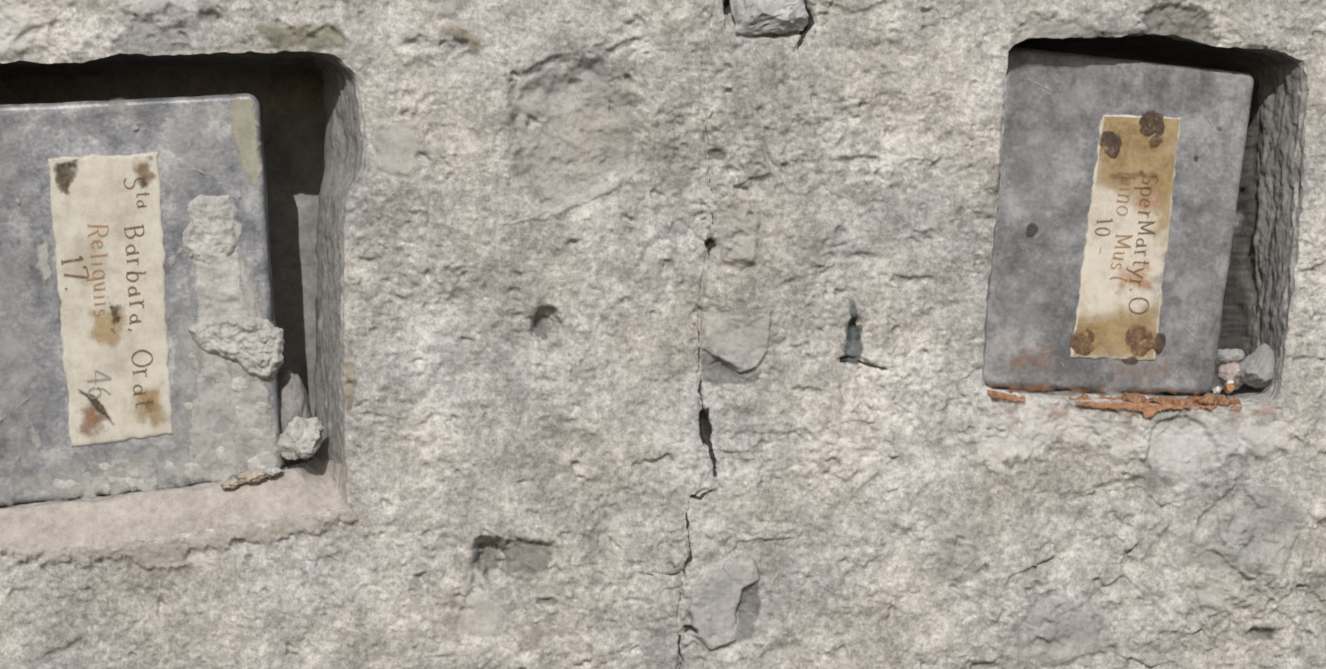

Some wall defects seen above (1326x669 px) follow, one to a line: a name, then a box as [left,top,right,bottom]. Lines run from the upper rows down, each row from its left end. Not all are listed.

rust [987,390,1026,402]
rust [1068,392,1242,418]
crack [648,174,717,669]